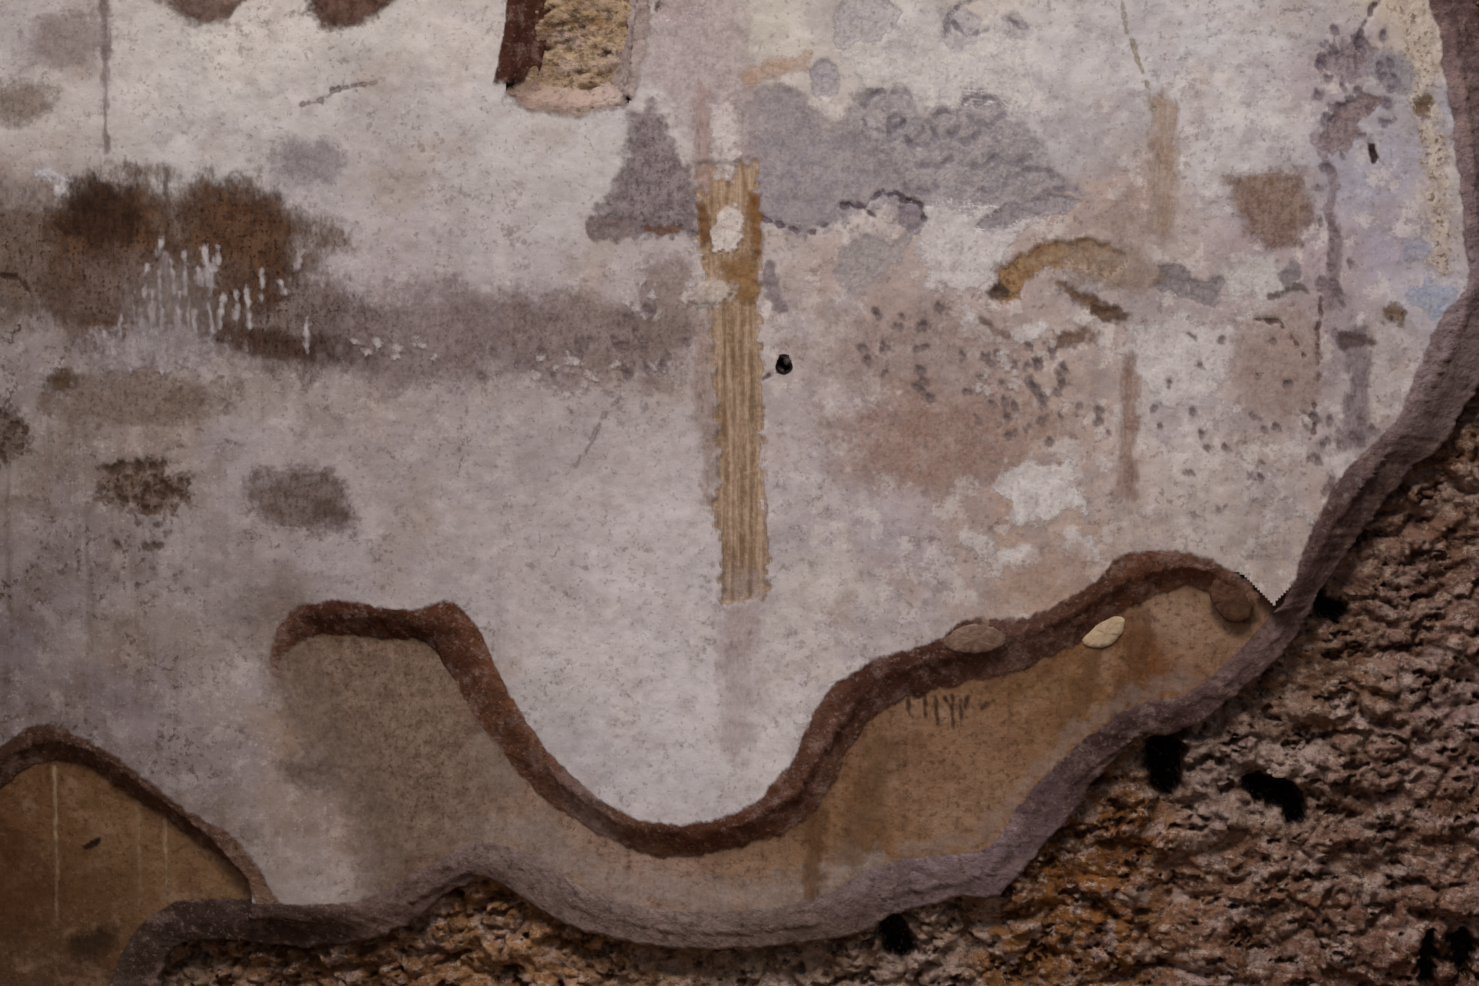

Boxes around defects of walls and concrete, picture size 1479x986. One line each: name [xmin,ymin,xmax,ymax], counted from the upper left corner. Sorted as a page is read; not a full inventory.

water stain [0,81,50,126]
water stain [36,0,110,152]
water stain [282,141,346,180]
crack [0,273,31,293]
water stain [762,260,788,312]
flaking render [1267,258,1354,309]
water stain [0,165,717,502]
flaking render [959,237,1224,446]
flaking render [95,454,194,550]
peeling [267,634,515,890]
spalling [1242,770,1305,827]
spalling [879,914,915,957]